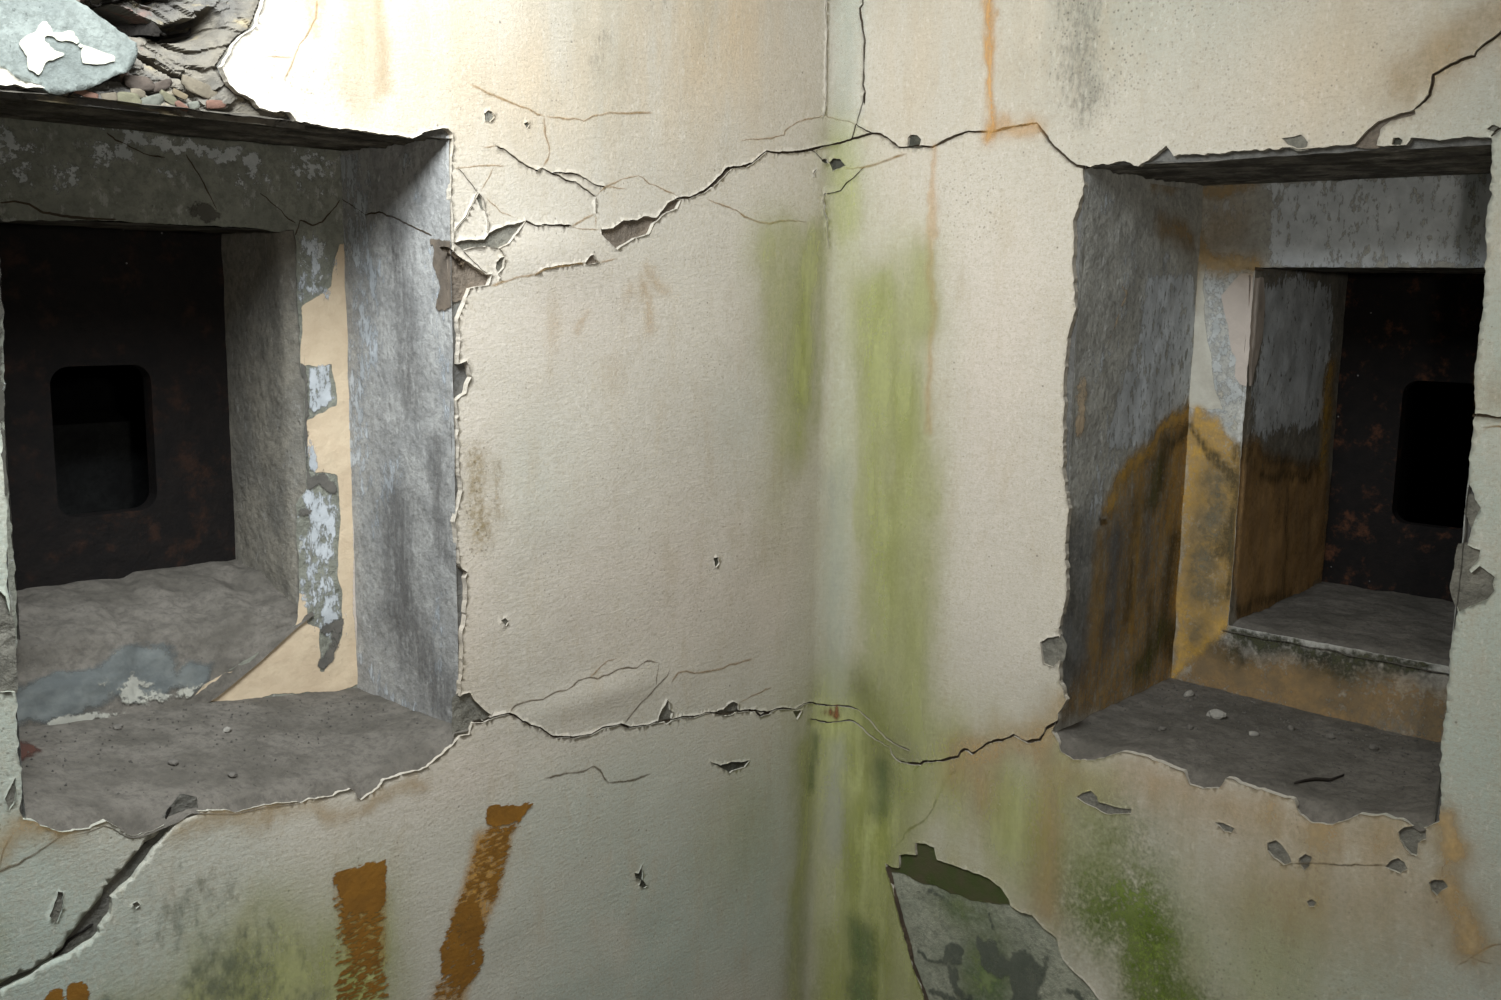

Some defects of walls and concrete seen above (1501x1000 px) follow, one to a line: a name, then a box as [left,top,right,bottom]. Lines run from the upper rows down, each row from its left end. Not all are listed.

peeling [0,124,272,200]
spalling [0,0,306,130]
crack [260,0,1091,285]
rust [985,0,995,137]
crack [1416,32,1501,109]
spalling [0,260,9,496]
peeling [47,148,490,738]
crack [1473,413,1501,427]
spalling [1450,494,1495,611]
crack [472,660,1058,846]
crack [0,794,198,987]
peeling [886,843,1099,1000]